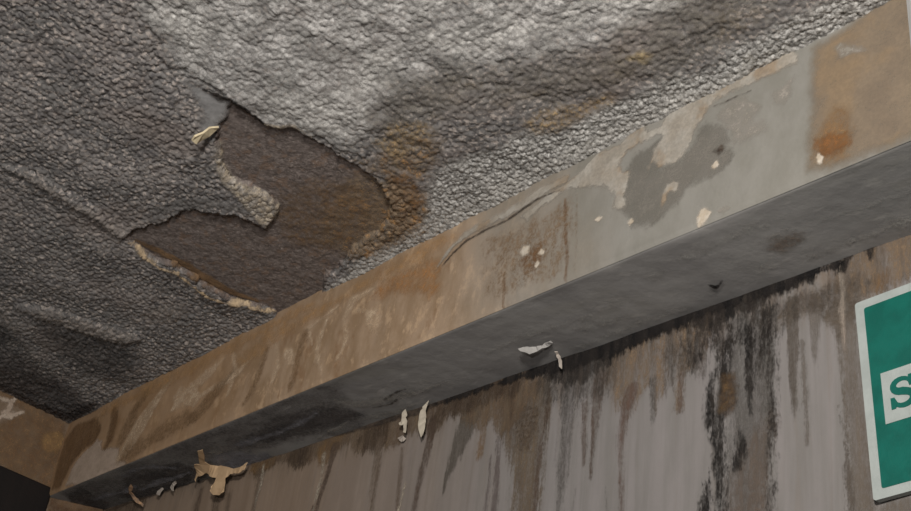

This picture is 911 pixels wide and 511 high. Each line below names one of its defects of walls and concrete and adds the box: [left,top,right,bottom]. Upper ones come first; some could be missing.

water stain [143,0,911,294]
peeling [521,52,798,221]
spalling [127,87,391,314]
crack [441,176,569,263]
peeling [697,207,726,227]
water stain [0,234,911,511]
peeling [518,341,562,369]
peeling [398,409,407,442]
peeling [418,401,429,437]
peeling [194,449,248,495]